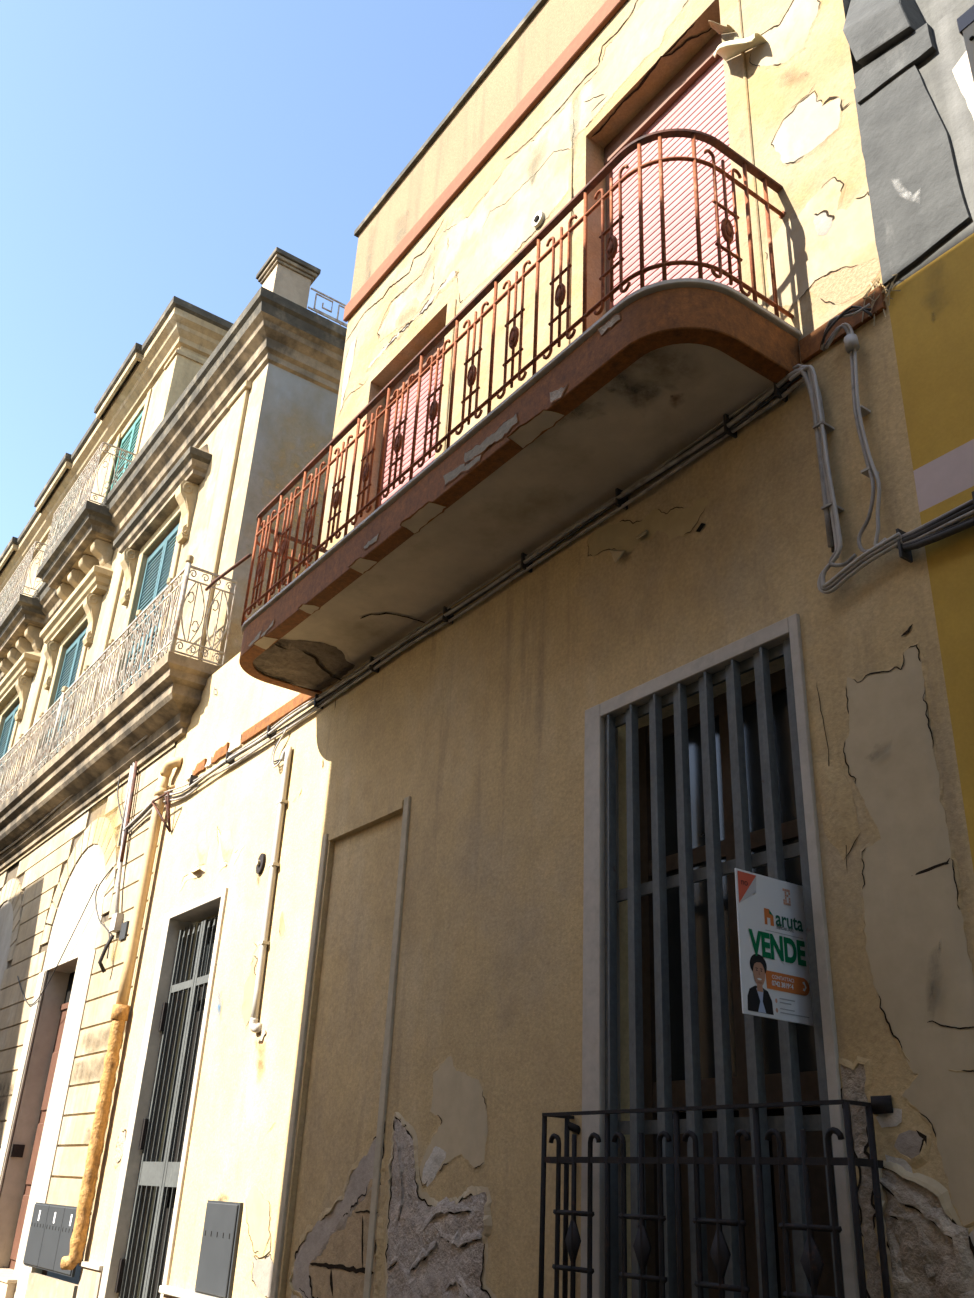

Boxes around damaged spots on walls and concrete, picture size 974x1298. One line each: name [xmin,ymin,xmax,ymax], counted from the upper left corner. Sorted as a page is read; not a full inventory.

peeling [708,0,822,69]
peeling [770,89,843,166]
crack [347,228,439,339]
spalling [248,618,359,691]
crack [817,688,829,766]
peeling [838,642,974,1298]
peeling [246,1183,274,1298]
spalling [289,1112,497,1298]